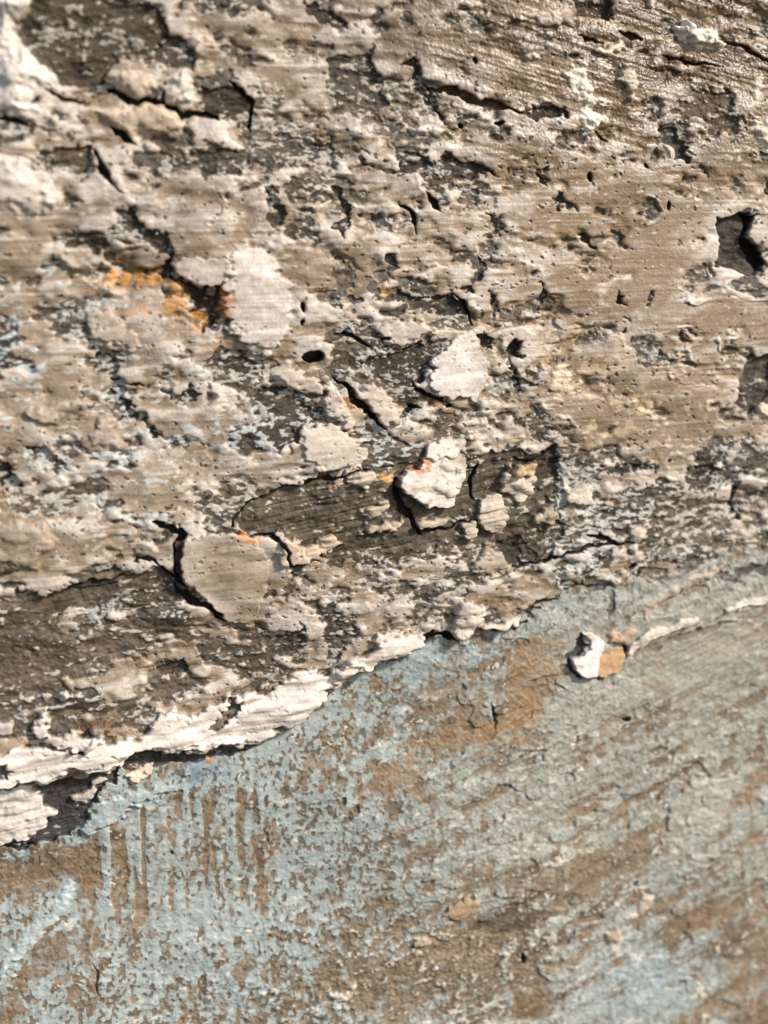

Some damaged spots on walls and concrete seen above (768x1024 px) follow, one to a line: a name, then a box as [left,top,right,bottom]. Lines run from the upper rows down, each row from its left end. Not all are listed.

spalling [17,0,197,99]
crack [106,87,220,121]
crack [229,81,255,134]
spalling [146,127,339,181]
spalling [358,151,498,209]
spalling [658,87,744,164]
spalling [714,212,766,276]
corrosion [102,258,238,361]
spalling [13,205,593,623]
crack [231,464,479,569]
peeling [564,632,629,681]
spalling [0,697,259,846]